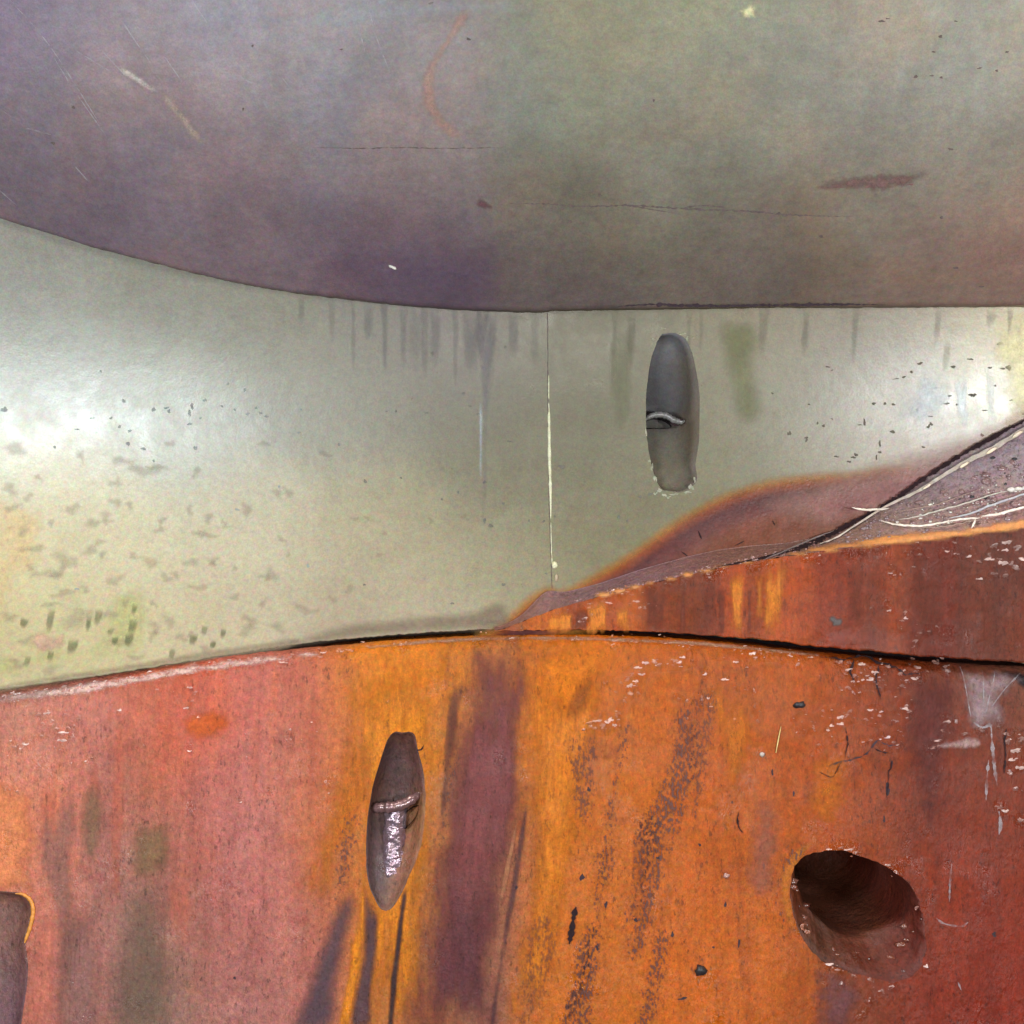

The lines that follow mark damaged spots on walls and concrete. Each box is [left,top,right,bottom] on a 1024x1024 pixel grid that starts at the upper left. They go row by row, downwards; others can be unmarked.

crack [544,312,552,412]
spalling [648,460,696,499]
rust [484,439,1024,636]
damp [5,642,291,700]
rust [0,785,35,943]
rust [323,683,431,882]
rust [341,840,423,1024]
rust [522,650,610,992]
rust [783,849,811,925]
spalling [826,963,895,1016]
rust [886,918,922,972]